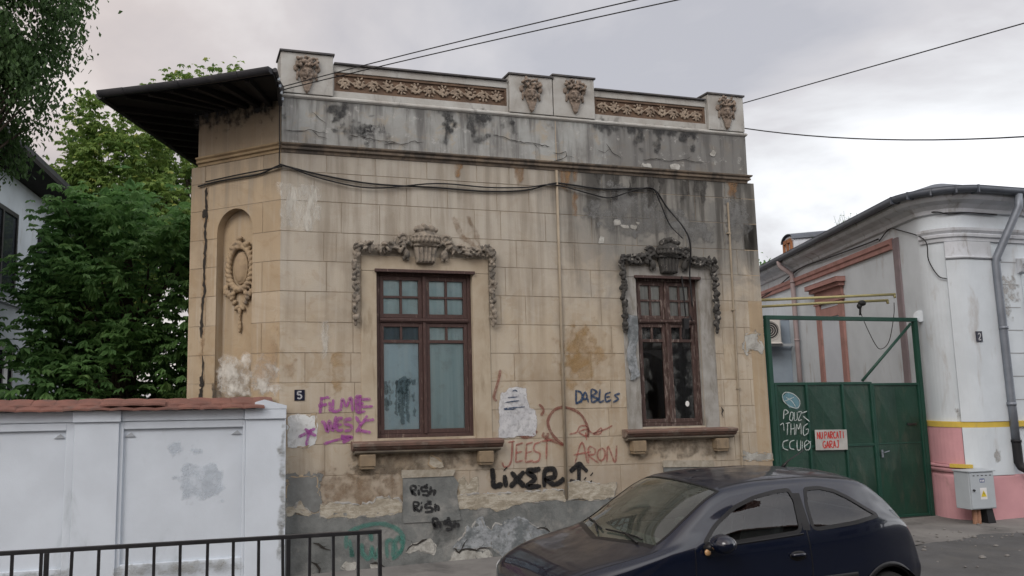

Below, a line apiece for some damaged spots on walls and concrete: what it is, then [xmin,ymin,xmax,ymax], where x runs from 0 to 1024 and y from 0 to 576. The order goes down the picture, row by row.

leakage [328,102,381,144]
crack [288,113,421,146]
leakage [438,111,491,143]
leakage [594,118,696,152]
leakage [583,173,713,242]
crack [198,188,208,397]
flaking render [742,330,764,356]
flaking render [285,475,403,519]
flaking render [449,477,617,561]
flaking render [405,538,437,555]